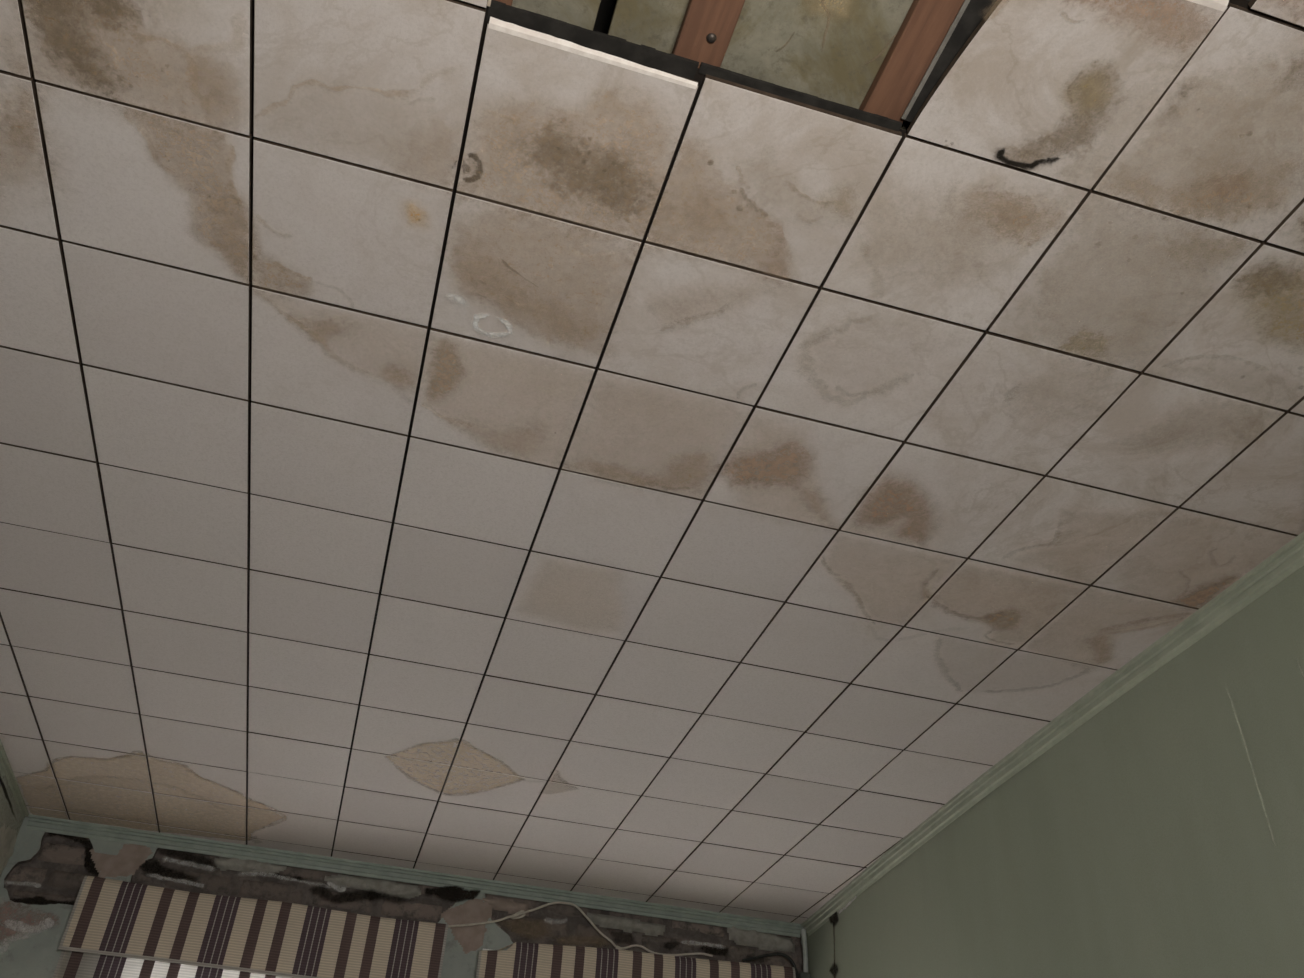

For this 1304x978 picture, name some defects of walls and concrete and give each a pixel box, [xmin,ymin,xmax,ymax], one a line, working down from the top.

water stain [464,111,660,223]
water stain [997,77,1102,169]
flaking render [5,832,99,905]
spalling [131,848,802,973]